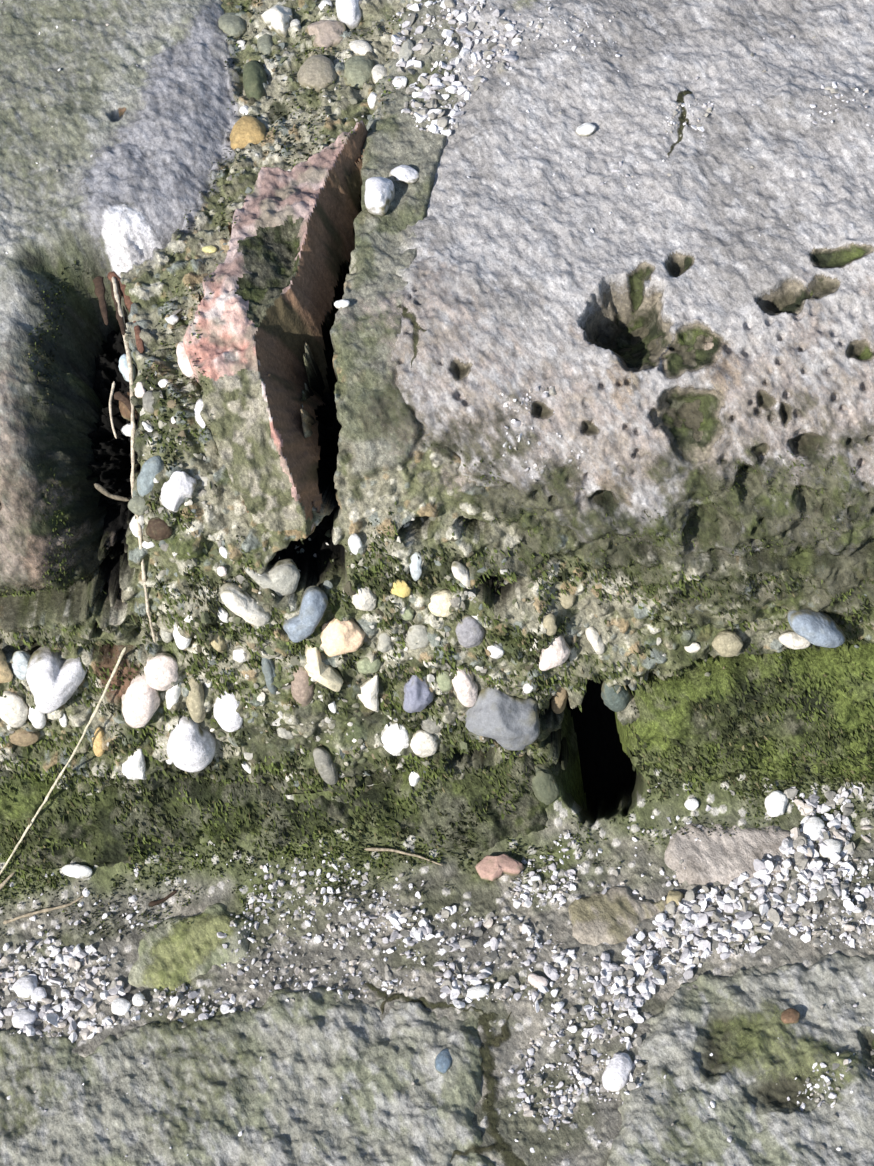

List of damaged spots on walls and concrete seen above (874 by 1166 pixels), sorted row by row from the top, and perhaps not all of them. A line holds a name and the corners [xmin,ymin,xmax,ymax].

hole [757,243,874,315]
spalling [334,300,350,309]
hole [581,252,726,463]
hole [846,339,874,361]
hole [757,390,821,456]
hole [735,443,770,479]
spalling [159,471,197,513]
spalling [589,490,617,502]
spalling [551,687,569,714]
crack [365,982,527,1166]